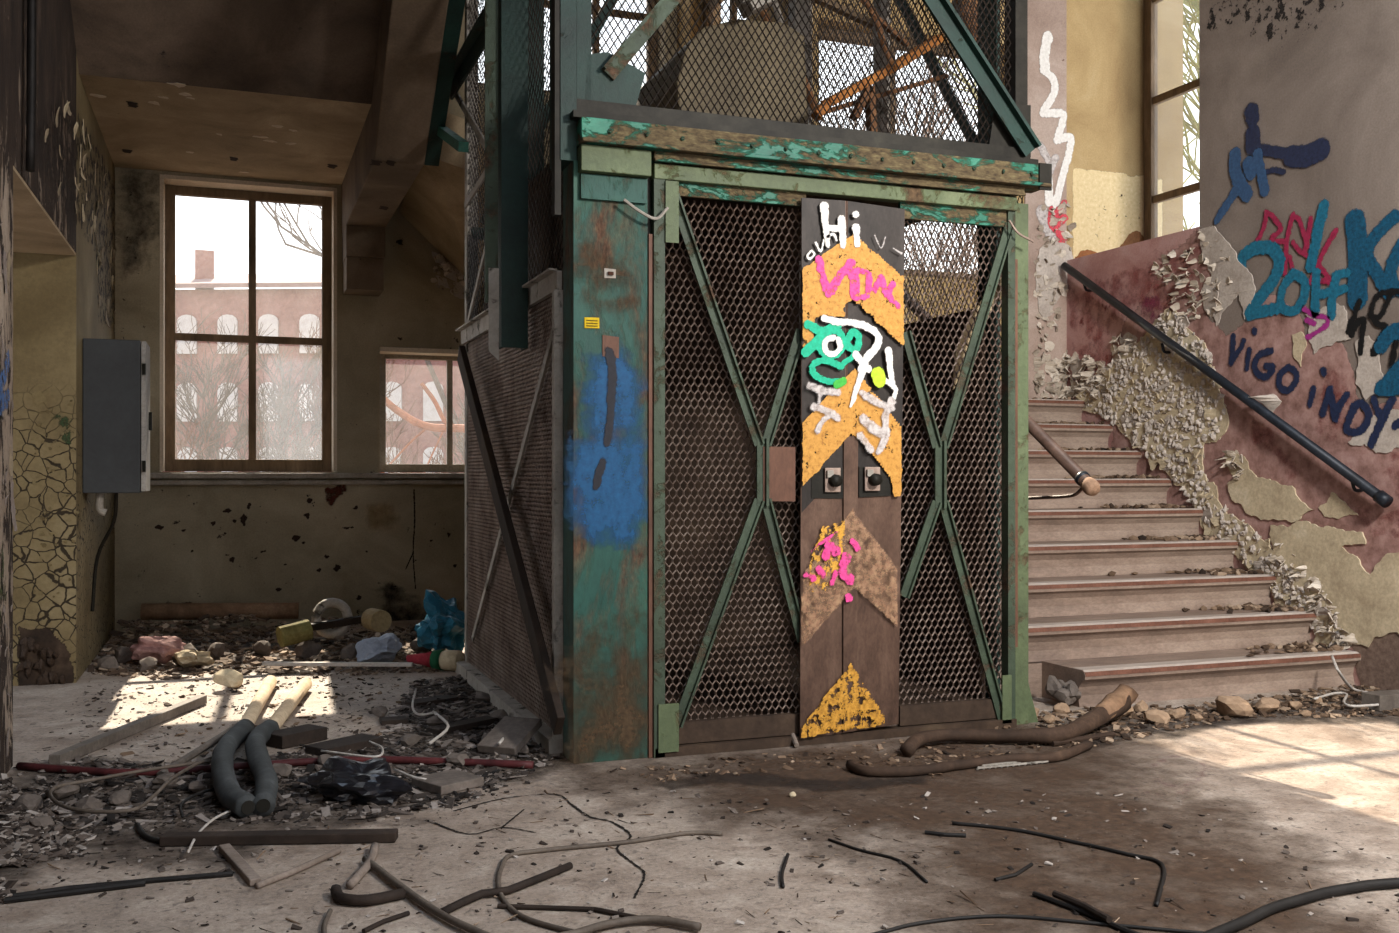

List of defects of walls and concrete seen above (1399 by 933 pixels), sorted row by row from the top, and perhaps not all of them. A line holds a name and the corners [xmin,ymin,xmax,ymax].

corrosion [618,234,653,758]
flaking render [1033,194,1399,691]